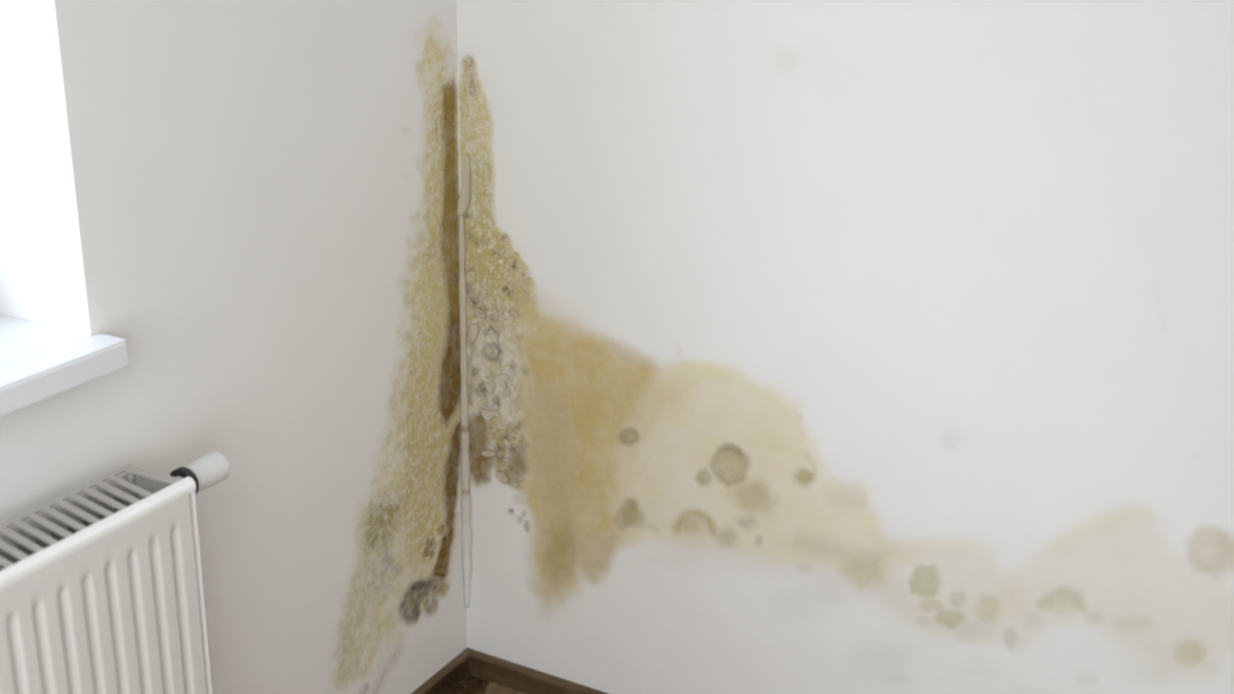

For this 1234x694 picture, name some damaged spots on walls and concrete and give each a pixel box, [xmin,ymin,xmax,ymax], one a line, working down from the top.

water stain [444,94,456,236]
water stain [411,252,487,619]